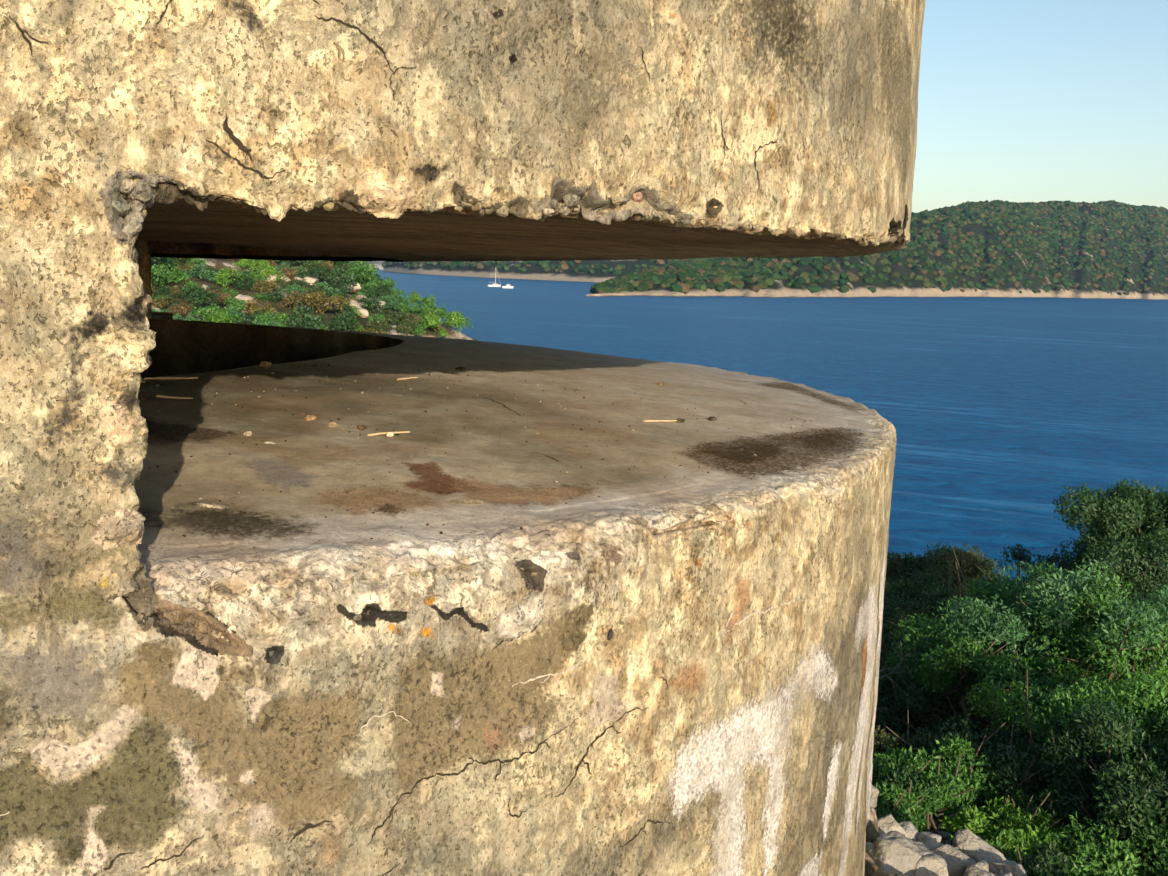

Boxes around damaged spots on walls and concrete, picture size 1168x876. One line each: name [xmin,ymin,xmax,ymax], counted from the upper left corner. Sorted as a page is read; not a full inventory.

crack [9,15,48,57]
crack [313,0,416,100]
crack [206,113,285,179]
spalling [99,170,237,245]
spalling [452,177,724,226]
leakage [704,432,848,464]
spalling [515,559,547,591]
spalling [122,561,284,701]
spalling [336,603,407,627]
spalling [429,604,489,632]
leakage [0,643,363,864]
crack [368,677,669,847]